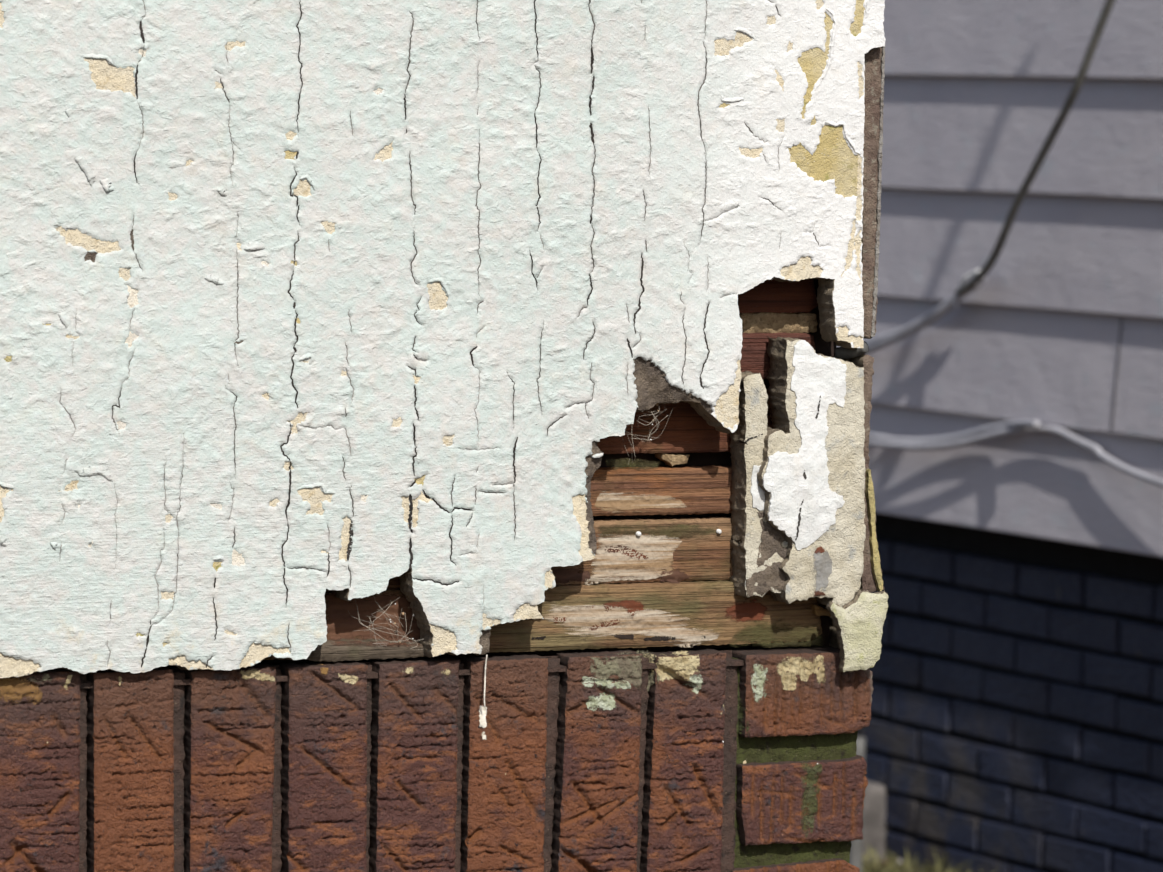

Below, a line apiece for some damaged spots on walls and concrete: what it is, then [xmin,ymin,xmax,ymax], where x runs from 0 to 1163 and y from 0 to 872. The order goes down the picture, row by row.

crack [134,0,146,181]
crack [280,0,354,650]
crack [404,0,596,604]
crack [626,107,652,393]
spalling [633,357,742,434]
crack [680,1,735,389]
peeling [760,0,871,349]
spalling [571,436,620,561]
crack [795,470,807,540]
spalling [0,653,143,678]
spalling [396,566,543,658]
flaking render [825,590,889,673]